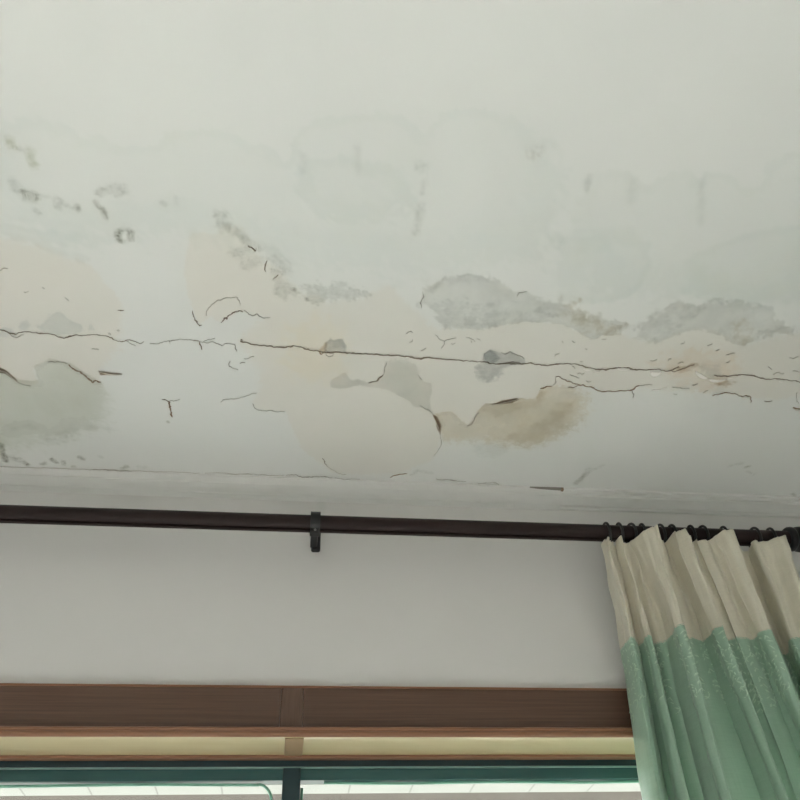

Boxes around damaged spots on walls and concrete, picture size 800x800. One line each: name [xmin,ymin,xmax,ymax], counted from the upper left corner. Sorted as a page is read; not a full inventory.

crack [0,329,800,402]